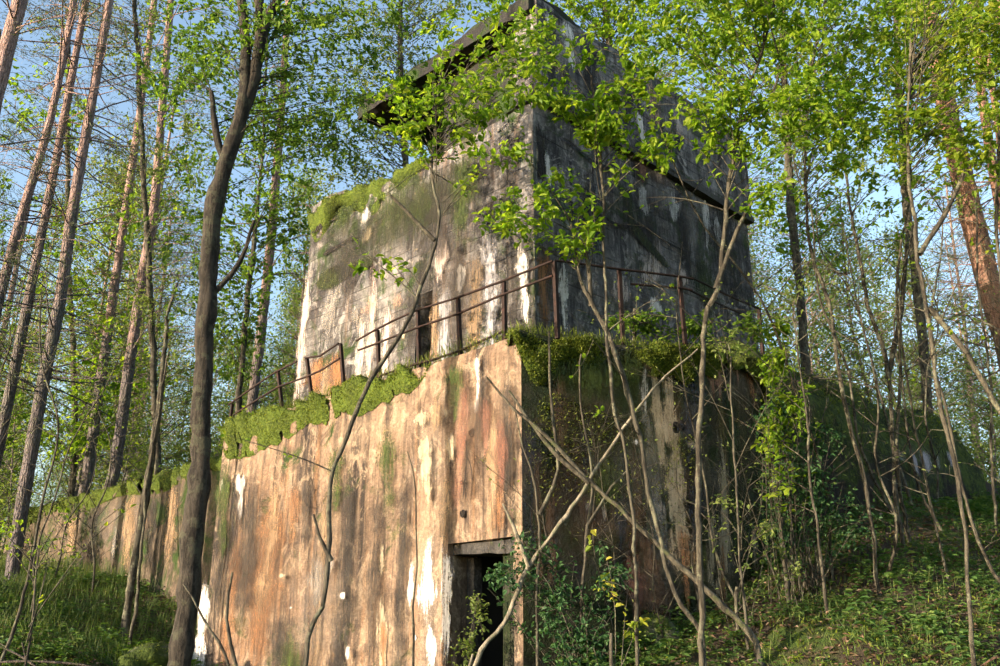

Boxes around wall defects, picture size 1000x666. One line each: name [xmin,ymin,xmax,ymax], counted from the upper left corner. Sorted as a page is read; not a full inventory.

corrosion [303,355,342,395]
damp [354,279,378,377]
damp [412,137,519,423]
damp [474,358,487,440]
damp [482,233,530,345]
corrosion [537,248,569,329]
damp [321,445,356,666]
damp [364,431,452,666]
damp [268,621,304,666]